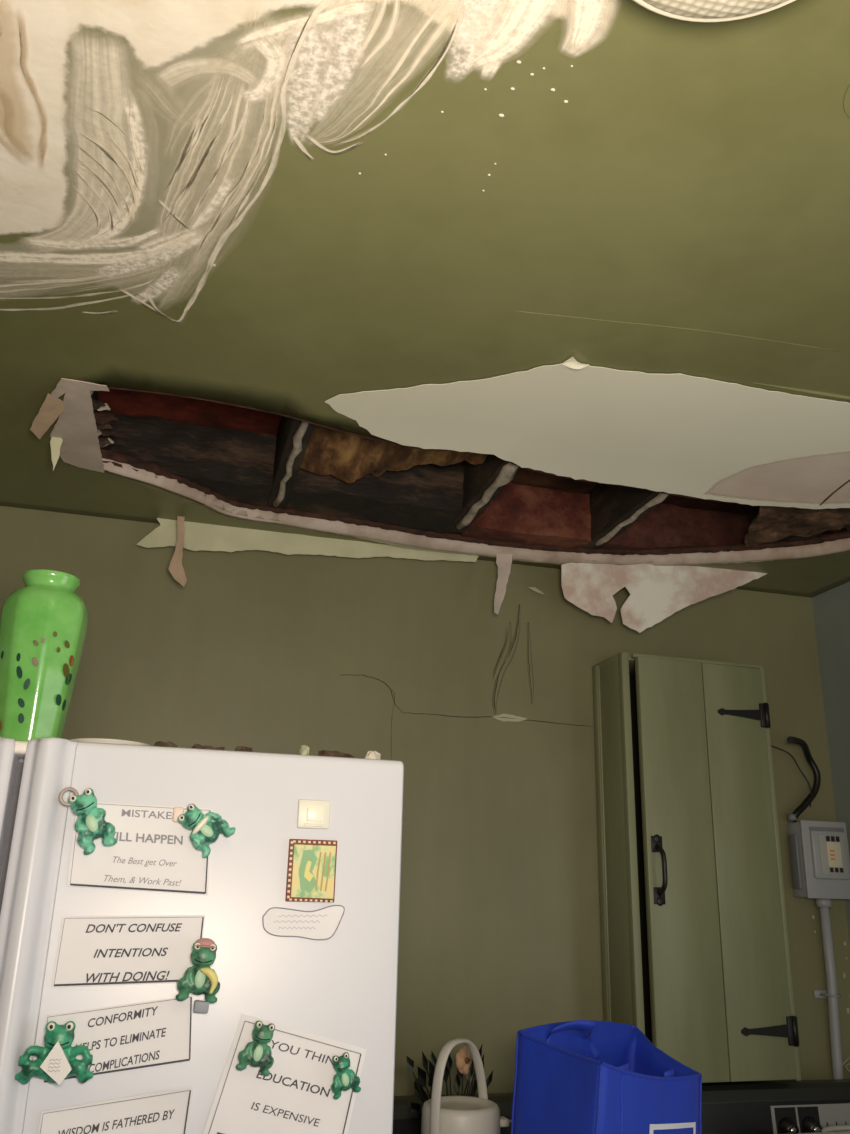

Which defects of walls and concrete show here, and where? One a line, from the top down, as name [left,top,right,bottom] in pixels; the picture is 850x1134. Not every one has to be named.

peeling [108,357,850,510]
spalling [102,458,850,566]
crack [347,674,593,727]